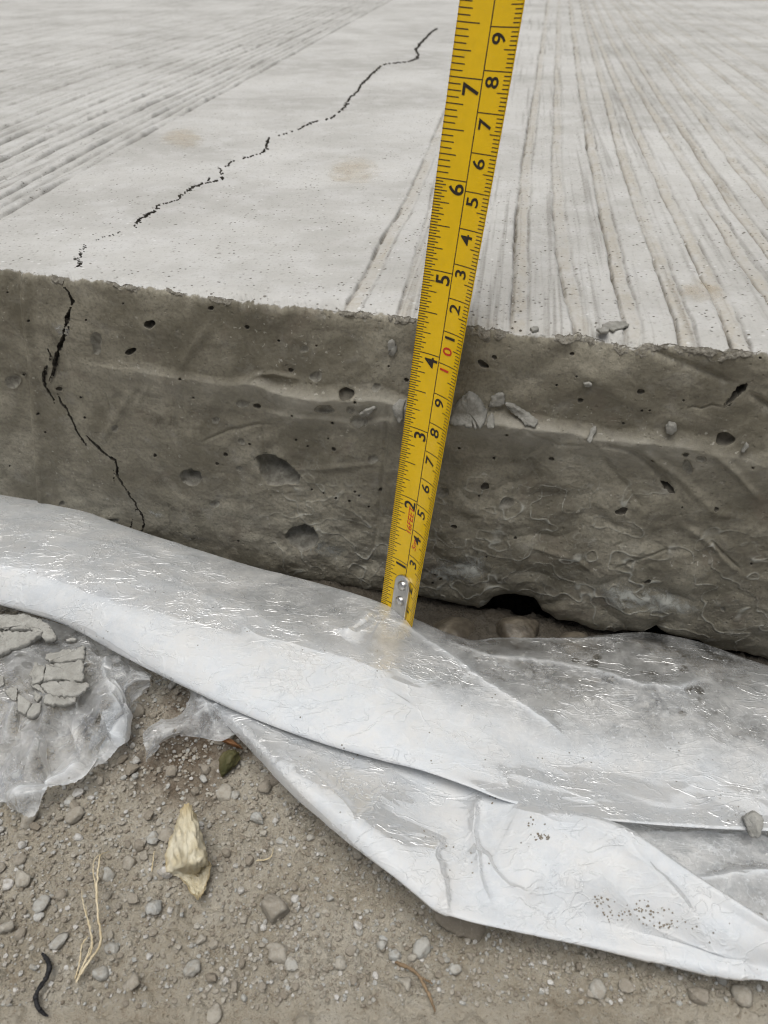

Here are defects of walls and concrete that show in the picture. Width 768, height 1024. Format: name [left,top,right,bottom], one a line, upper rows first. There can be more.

crack [42,29,437,532]